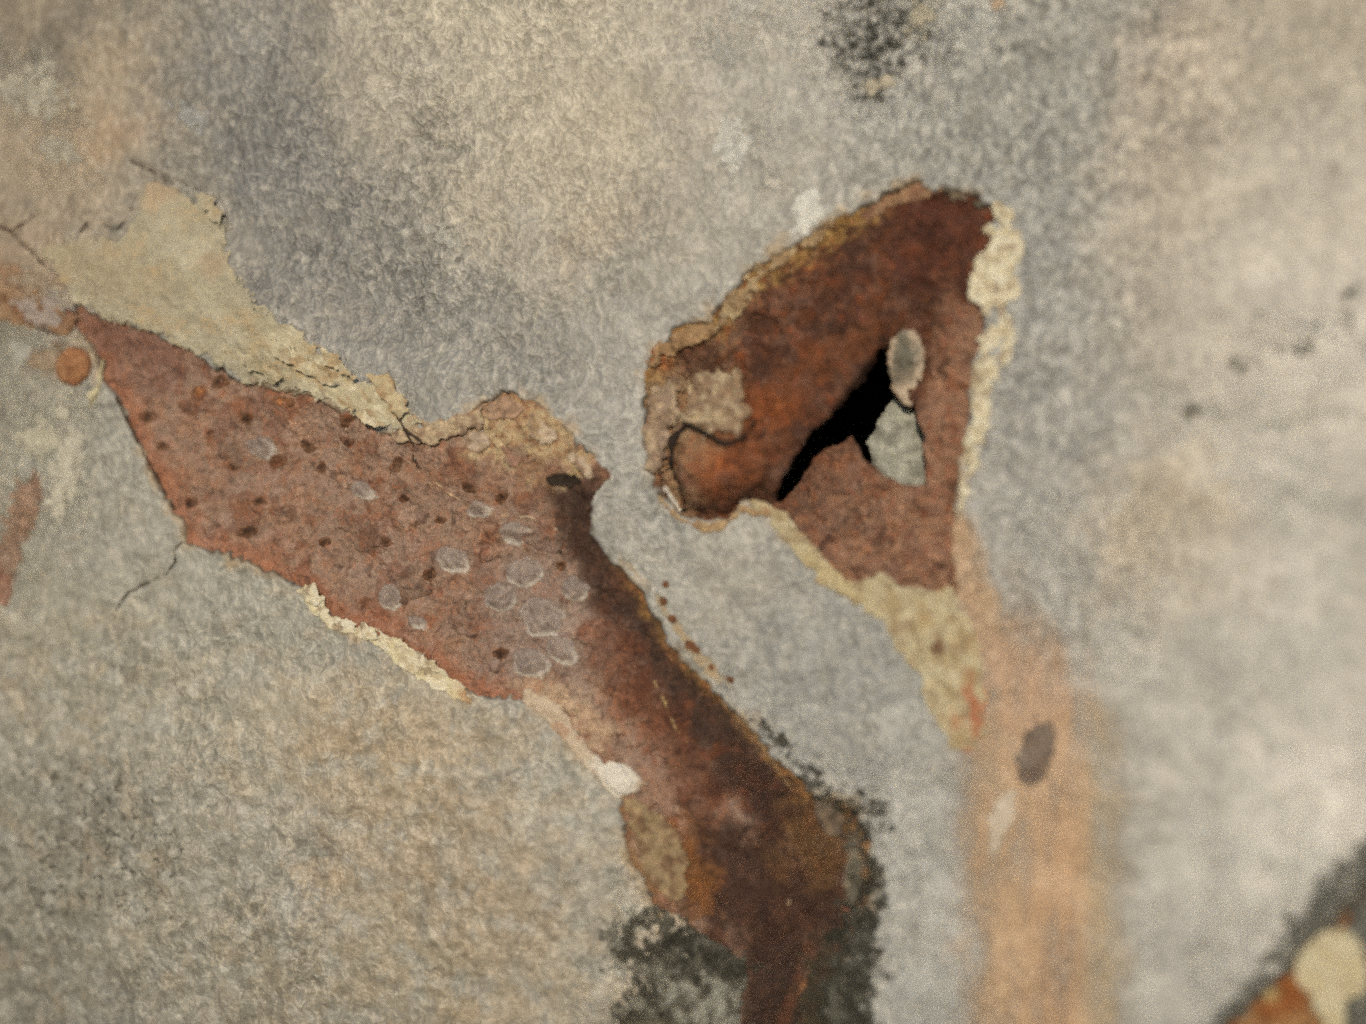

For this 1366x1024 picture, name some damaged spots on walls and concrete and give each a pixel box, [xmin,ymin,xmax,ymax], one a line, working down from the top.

damp [843,10,903,70]
crack [0,211,46,268]
peeling [10,181,422,431]
rust [641,180,995,596]
crack [115,395,183,618]
peeling [296,583,472,703]
rust [0,261,873,1024]
peeling [750,499,991,753]
peeling [522,689,648,799]
rust [1014,715,1056,786]
damp [1213,839,1366,1024]
peeling [1294,928,1366,1024]